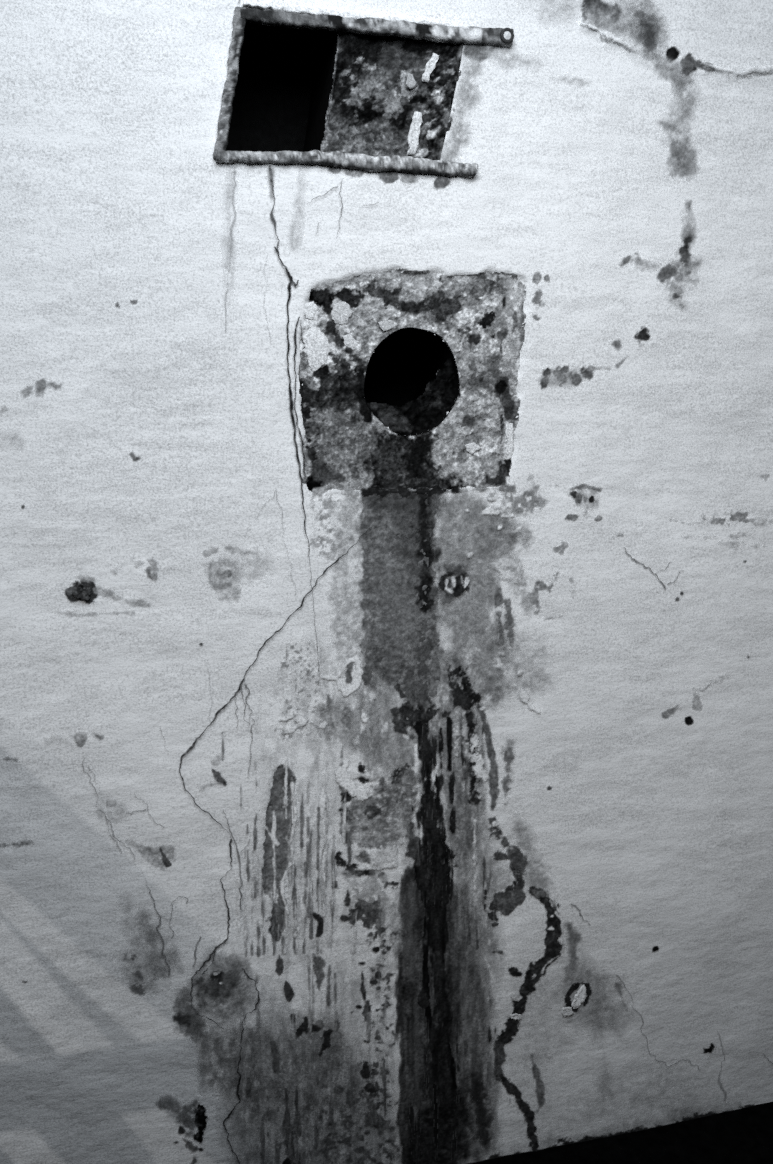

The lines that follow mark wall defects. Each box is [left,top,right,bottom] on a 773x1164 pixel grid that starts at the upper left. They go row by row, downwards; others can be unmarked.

leakage [443,44,508,162]
leakage [582,0,715,176]
leakage [532,272,550,320]
leakage [540,366,601,388]
leakage [635,327,650,342]
leakage [621,223,699,308]
crack [82,165,378,1164]
leakage [310,483,574,1164]
peeling [229,645,421,1164]
leakage [564,923,621,1025]
leakage [270,1041,279,1073]
leakage [656,1107,695,1126]